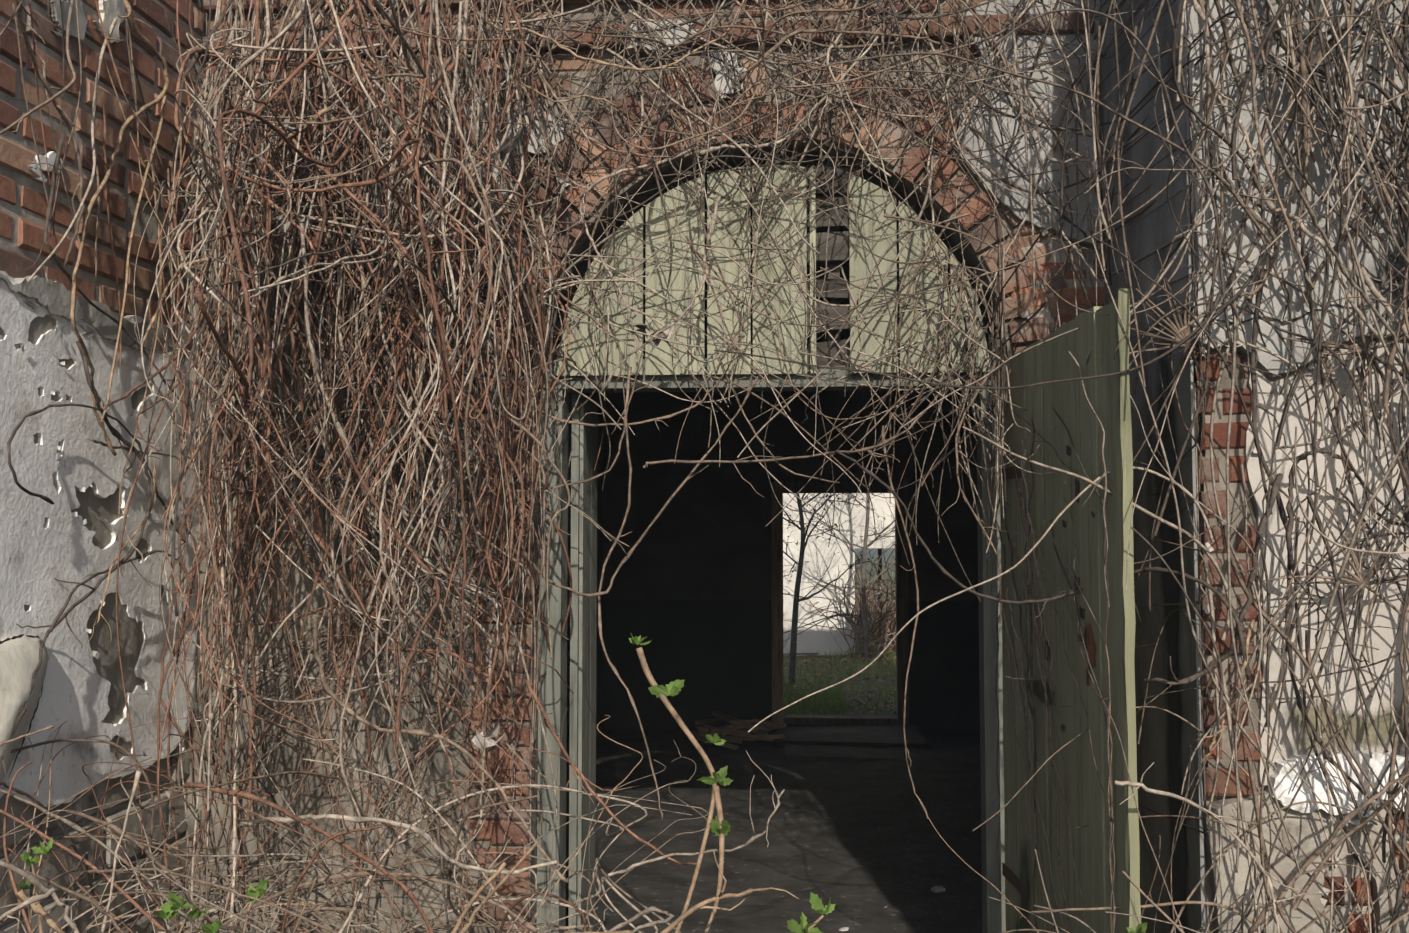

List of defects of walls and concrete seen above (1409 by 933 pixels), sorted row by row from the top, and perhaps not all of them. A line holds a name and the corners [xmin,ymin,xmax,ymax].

peeling [71,484,124,549]
peeling [85,592,145,760]
flaking render [1319,855,1373,933]
flaking render [1350,810,1409,898]